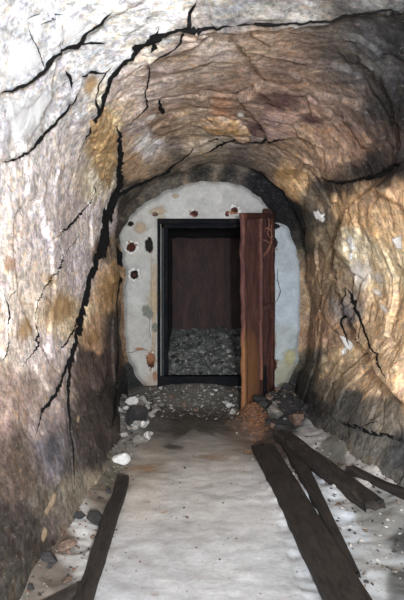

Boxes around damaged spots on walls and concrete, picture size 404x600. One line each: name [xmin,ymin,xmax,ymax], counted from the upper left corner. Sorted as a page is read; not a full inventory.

rust [136,265,157,363]
crack [2,2,403,485]